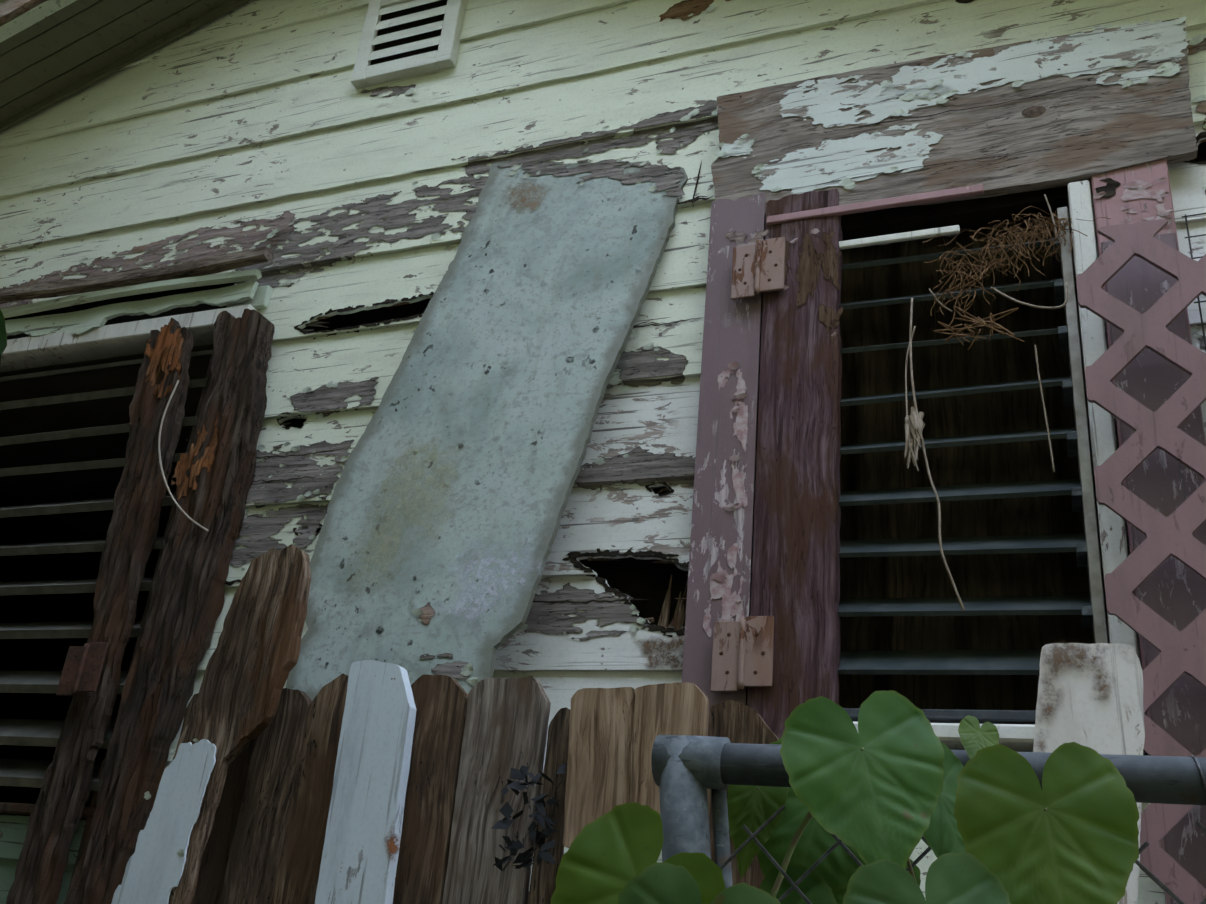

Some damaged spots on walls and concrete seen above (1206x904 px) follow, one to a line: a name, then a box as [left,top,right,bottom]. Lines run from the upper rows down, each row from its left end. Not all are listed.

peeling [659,0,731,22]
peeling [0,13,1206,309]
spalling [294,292,434,339]
peeling [784,228,843,344]
peeling [608,343,688,392]
peeling [230,377,379,571]
peeling [575,446,696,496]
peeling [718,361,748,511]
peeling [519,547,689,641]
peeling [703,543,744,637]